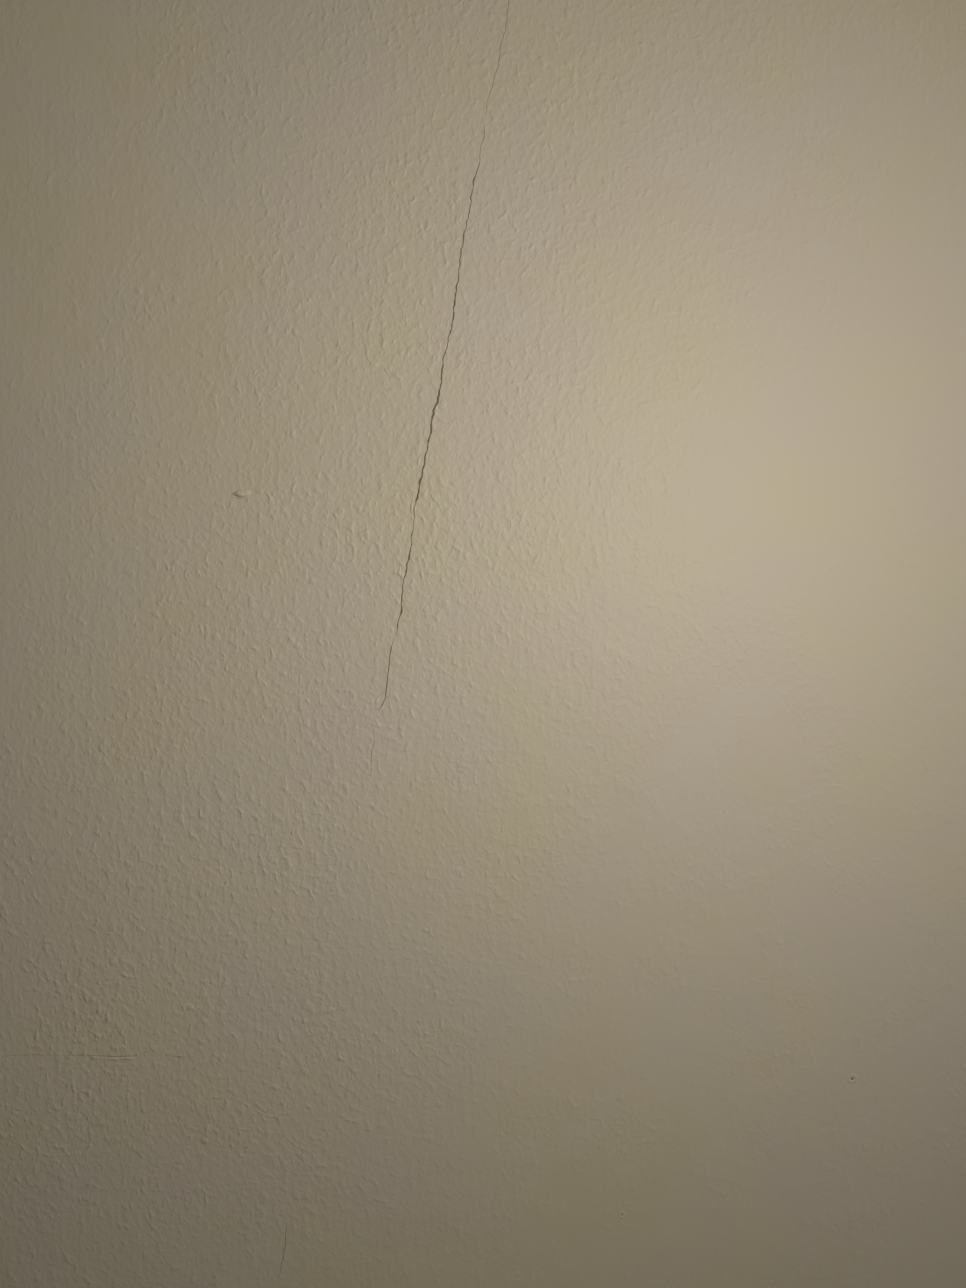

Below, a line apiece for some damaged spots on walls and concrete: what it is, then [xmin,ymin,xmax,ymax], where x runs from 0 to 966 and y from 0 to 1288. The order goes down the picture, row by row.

crack [370,2,509,776]